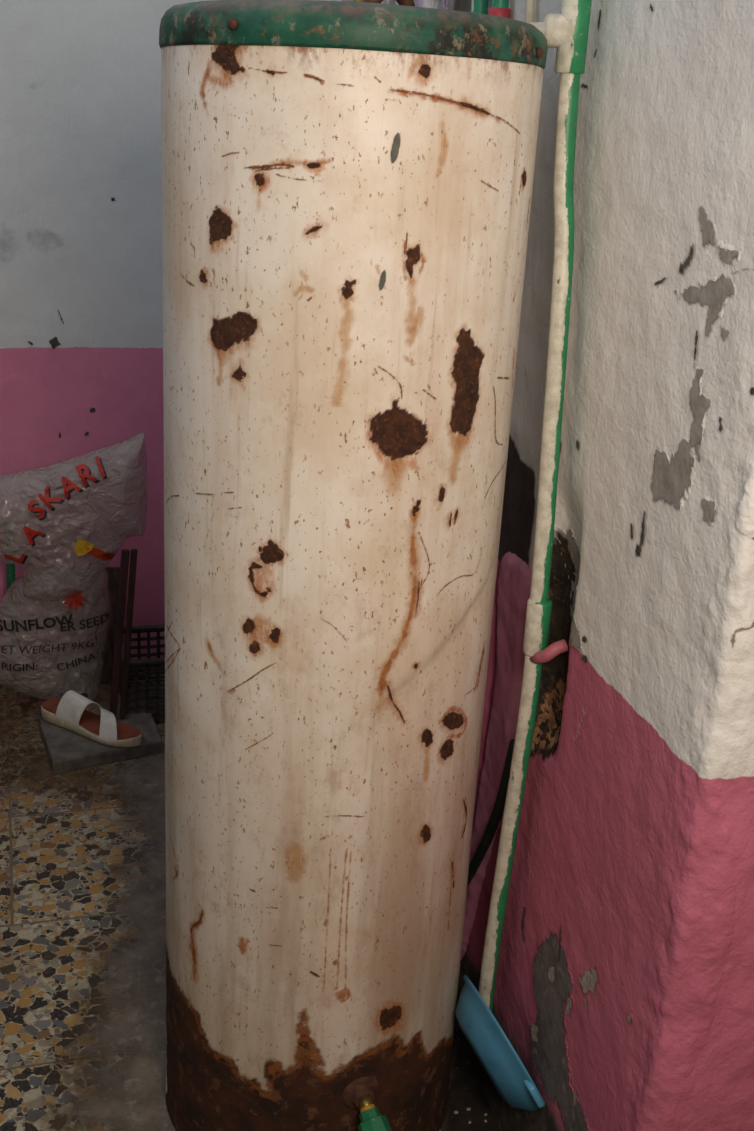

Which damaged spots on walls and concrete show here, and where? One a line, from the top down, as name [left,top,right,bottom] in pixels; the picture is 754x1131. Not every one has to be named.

peeling [630,204,741,557]
crack [731,623,754,647]
peeling [521,908,598,1131]